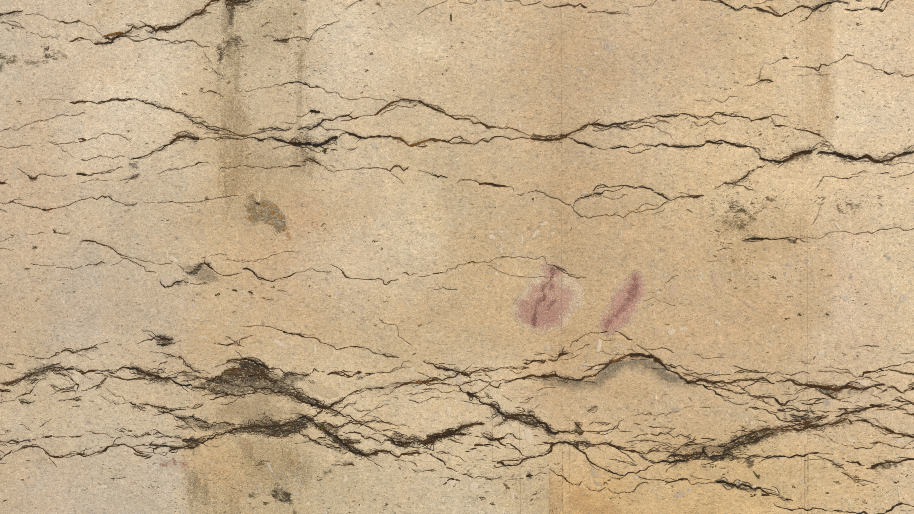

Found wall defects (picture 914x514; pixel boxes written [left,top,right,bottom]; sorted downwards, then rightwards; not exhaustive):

crack [0,0,914,300]
crack [0,311,914,514]